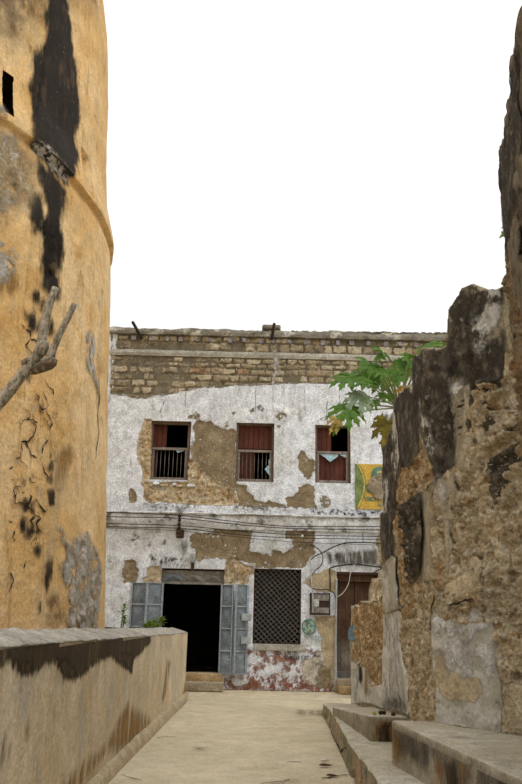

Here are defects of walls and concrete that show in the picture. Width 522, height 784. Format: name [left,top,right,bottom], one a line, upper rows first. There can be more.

peeling [0,132,69,212]
damp [26,0,80,334]
crack [21,306,37,365]
crack [9,381,56,591]
spalling [128,412,331,512]
spalling [392,252,522,734]
peeling [59,527,103,629]
spalling [122,559,161,583]
peeling [190,529,316,585]
peeling [305,569,337,593]
damp [0,636,151,680]
peeling [224,649,334,692]